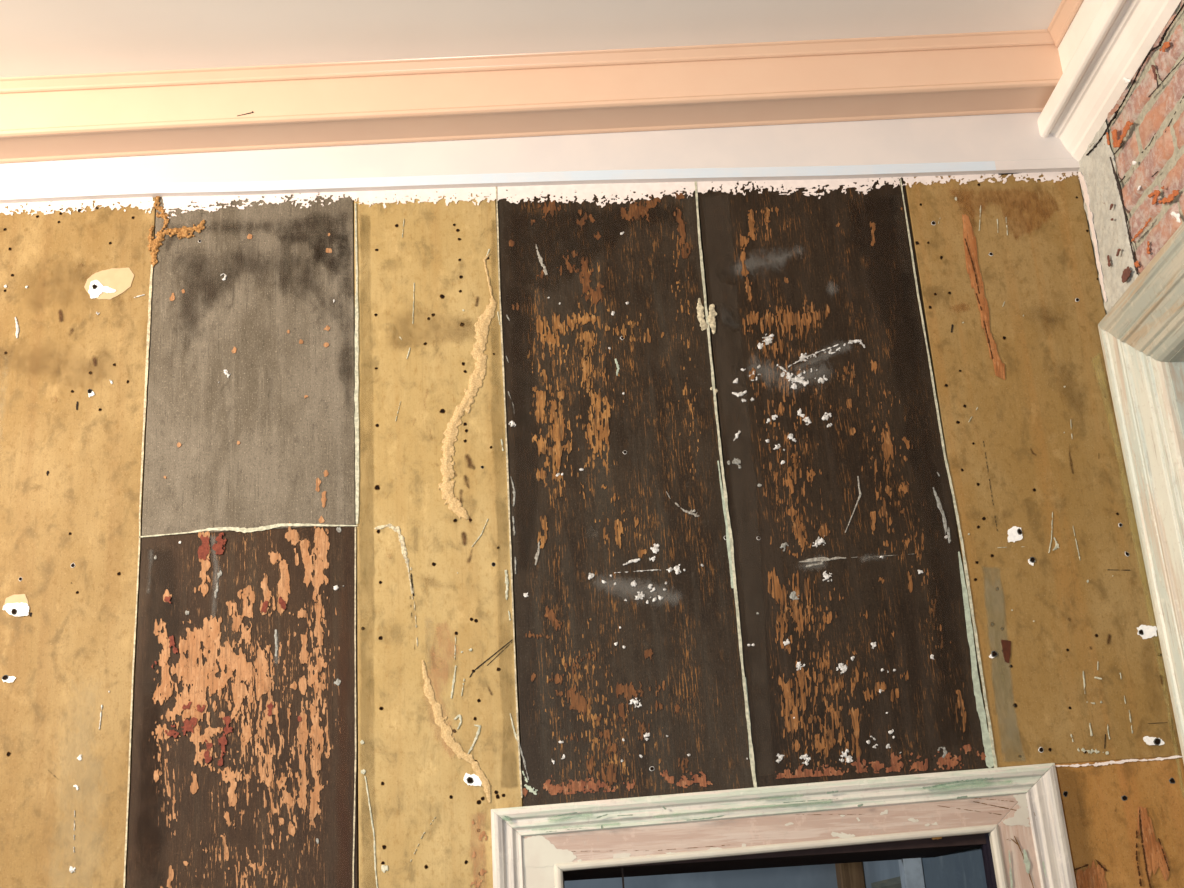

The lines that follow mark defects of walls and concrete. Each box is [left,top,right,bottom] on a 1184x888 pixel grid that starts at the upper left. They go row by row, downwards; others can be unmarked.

peeling [531,200,601,240]
peeling [527,250,664,558]
peeling [621,194,662,222]
peeling [664,193,701,473]
peeling [740,206,986,779]
spalling [962,214,1005,380]
crack [1086,3,1184,274]
peeling [151,470,342,888]
peeling [526,606,713,795]